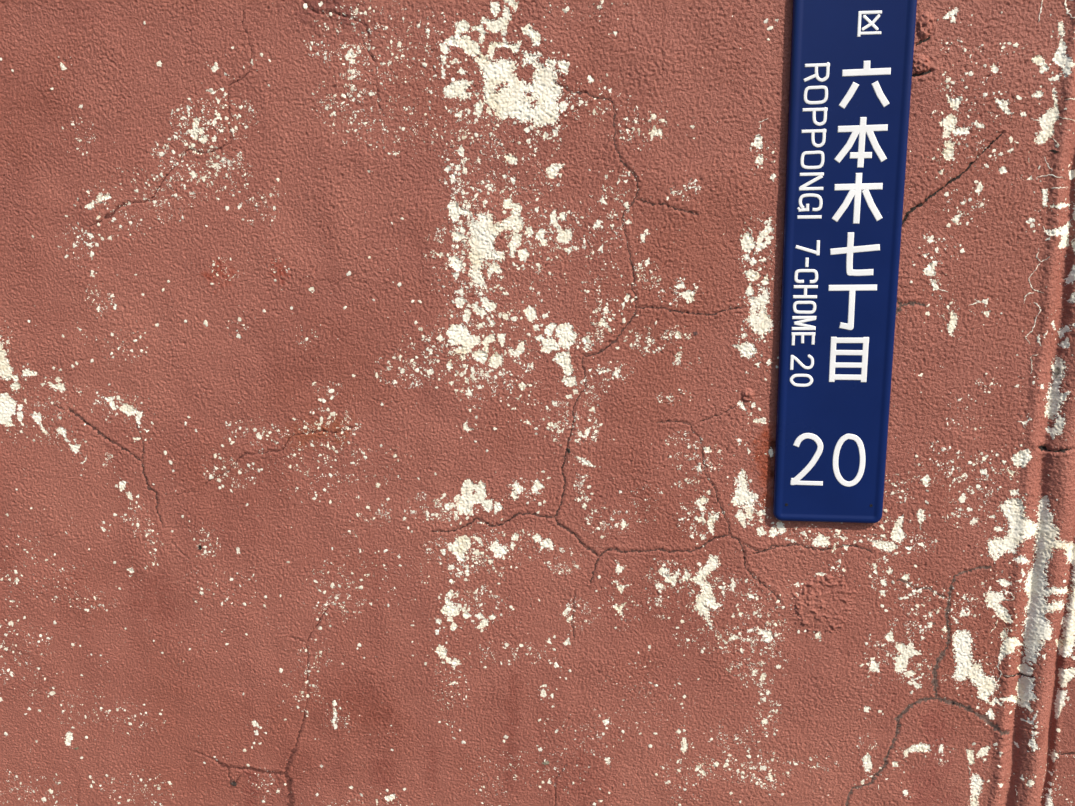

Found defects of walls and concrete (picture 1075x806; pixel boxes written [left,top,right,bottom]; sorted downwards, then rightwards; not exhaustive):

peeling [0,327,154,476]
peeling [58,46,280,318]
crack [54,405,356,559]
crack [198,608,328,806]
peeling [303,0,698,452]
peeling [204,381,1075,806]
crack [431,84,873,640]
peeling [730,212,779,380]
crack [845,566,1010,806]
peeling [910,180,1002,337]
peeling [931,0,1075,178]
peeling [1015,157,1075,439]